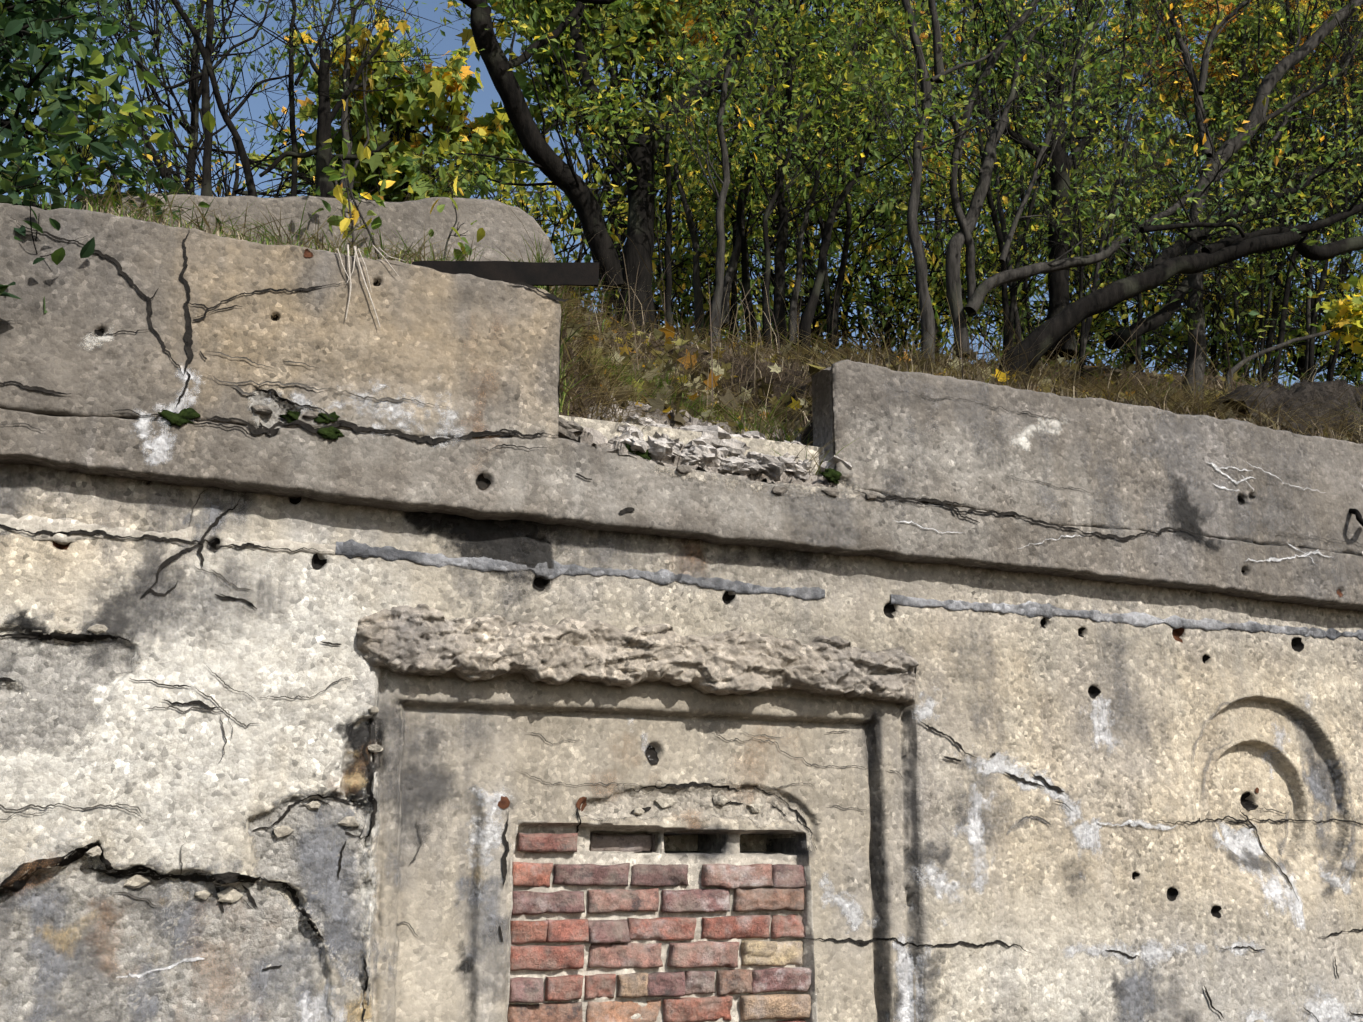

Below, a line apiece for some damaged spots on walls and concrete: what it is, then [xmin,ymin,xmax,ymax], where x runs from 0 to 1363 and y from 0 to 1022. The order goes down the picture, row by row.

crack [0,217,559,451]
water stain [1152,413,1323,551]
crack [0,489,336,609]
water stain [1246,544,1338,584]
crack [130,666,353,764]
crack [921,722,1072,811]
spalling [0,706,384,1022]
water stain [821,876,876,931]
crack [804,937,1031,953]
water stain [893,937,943,1022]
water stain [917,842,958,899]
crack [1128,807,1363,901]